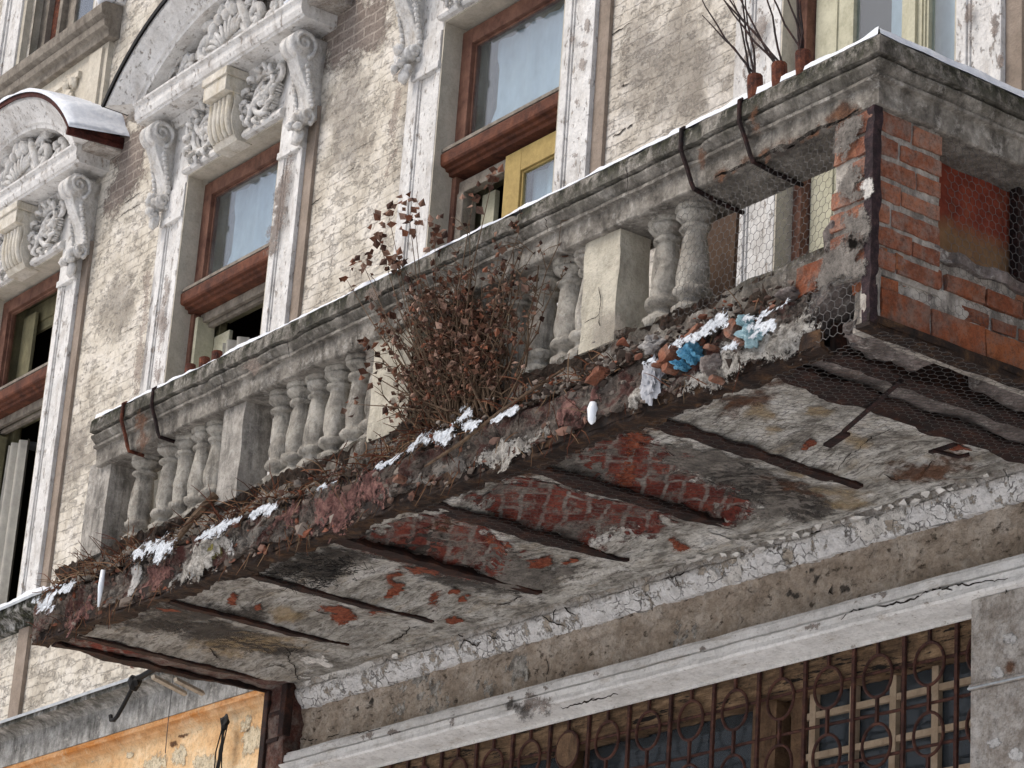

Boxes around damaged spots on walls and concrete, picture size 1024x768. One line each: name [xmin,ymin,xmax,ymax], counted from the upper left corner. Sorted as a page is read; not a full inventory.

corrosion [885,449,973,484]
spalling [137,385,989,626]
spalling [59,589,142,669]
crack [458,634,497,650]
crack [542,607,576,626]
crack [829,578,1008,620]